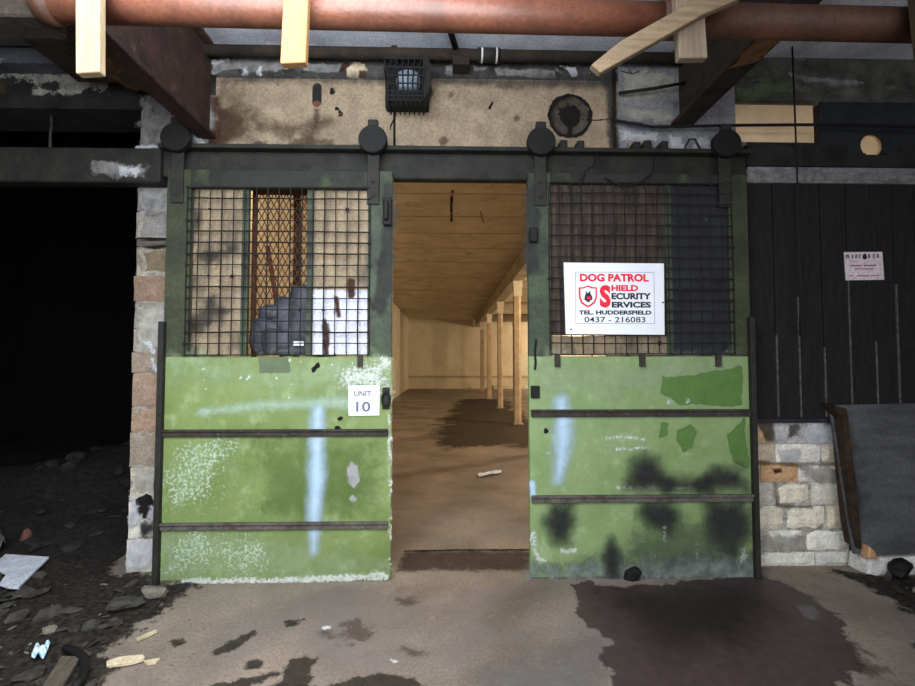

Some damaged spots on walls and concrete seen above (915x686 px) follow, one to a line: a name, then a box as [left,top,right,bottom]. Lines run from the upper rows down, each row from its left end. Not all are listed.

peeling [0,58,111,96]
peeling [136,97,171,148]
peeling [91,160,167,216]
damp [571,576,868,686]